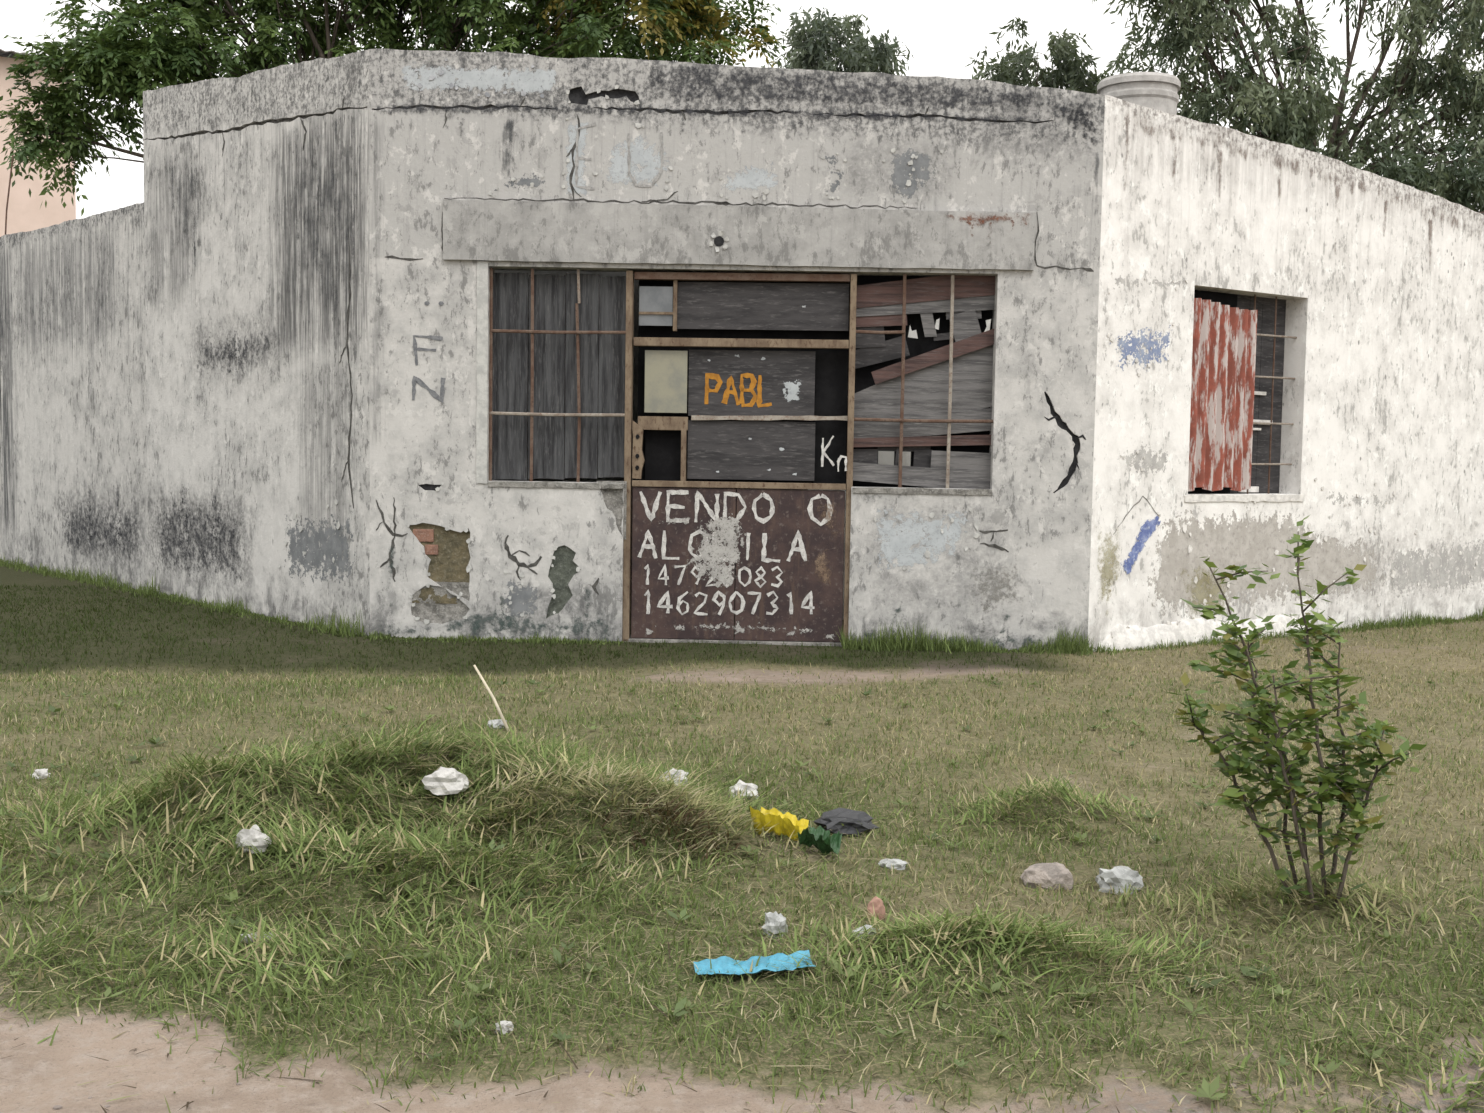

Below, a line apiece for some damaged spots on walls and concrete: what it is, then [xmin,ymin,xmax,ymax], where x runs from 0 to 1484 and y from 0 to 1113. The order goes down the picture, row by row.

crack [148,97,1050,261]
damp [304,163,354,309]
damp [197,323,268,372]
crack [339,230,408,582]
crack [1044,392,1086,493]
damp [61,492,138,558]
damp [157,489,244,578]
spalling [407,523,472,625]
crack [504,535,542,581]
spalling [503,545,581,619]
crack [979,529,1009,552]